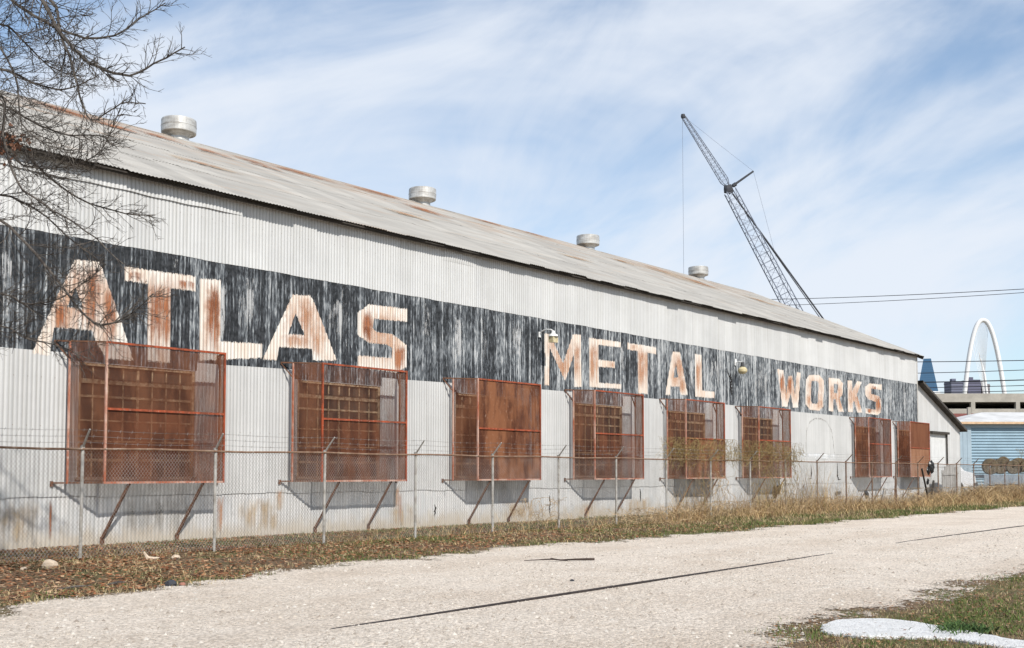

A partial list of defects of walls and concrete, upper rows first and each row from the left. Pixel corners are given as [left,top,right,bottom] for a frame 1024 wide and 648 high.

peeling [2,253,12,322]
corrosion [56,277,115,332]
corrosion [148,292,169,339]
corrosion [209,291,219,343]
peeling [238,283,254,328]
peeling [329,290,347,347]
corrosion [364,316,405,370]